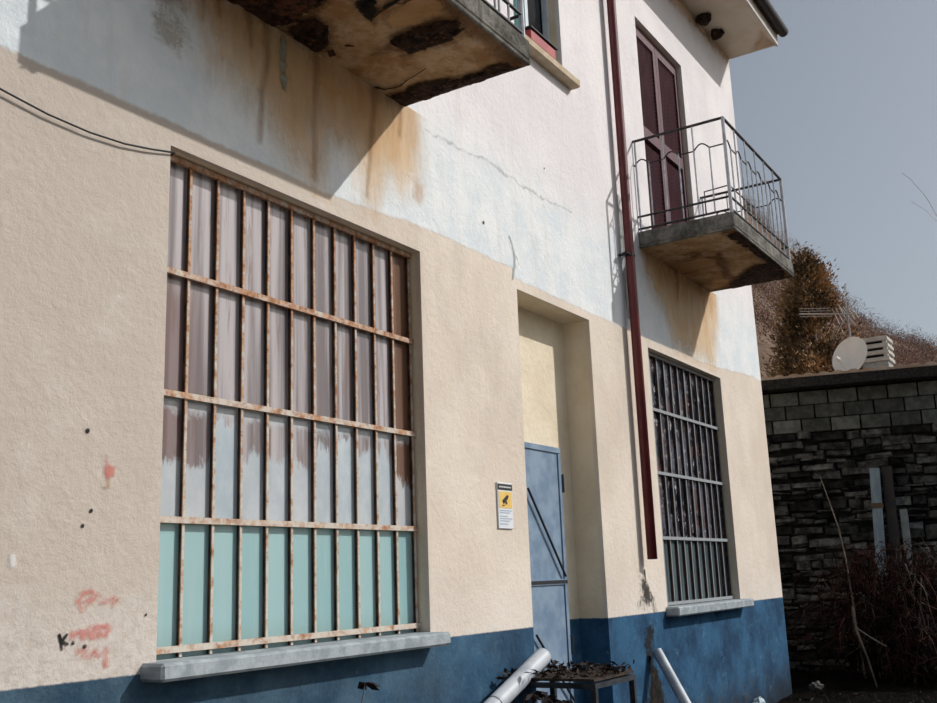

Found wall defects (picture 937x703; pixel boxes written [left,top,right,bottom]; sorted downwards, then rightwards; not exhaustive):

spalling [376,20,465,56]
spalling [389,63,521,107]
damp [640,569,655,615]
damp [644,626,665,703]